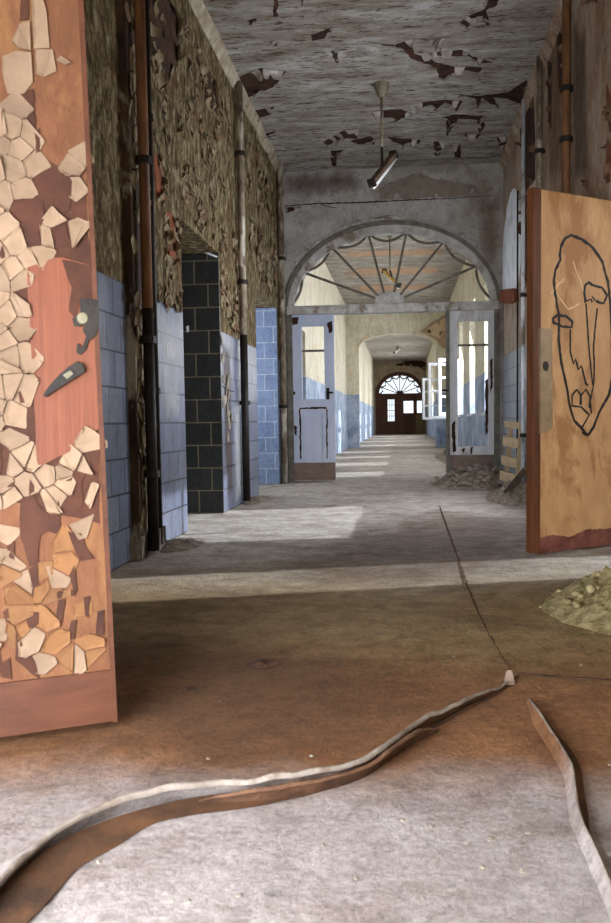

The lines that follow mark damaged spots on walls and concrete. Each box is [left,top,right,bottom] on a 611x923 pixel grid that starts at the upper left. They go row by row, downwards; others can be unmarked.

peeling [311,27,333,41]
peeling [460,0,499,31]
peeling [600,84,611,183]
peeling [0,0,108,679]
peeling [134,289,148,530]
crack [0,507,611,923]